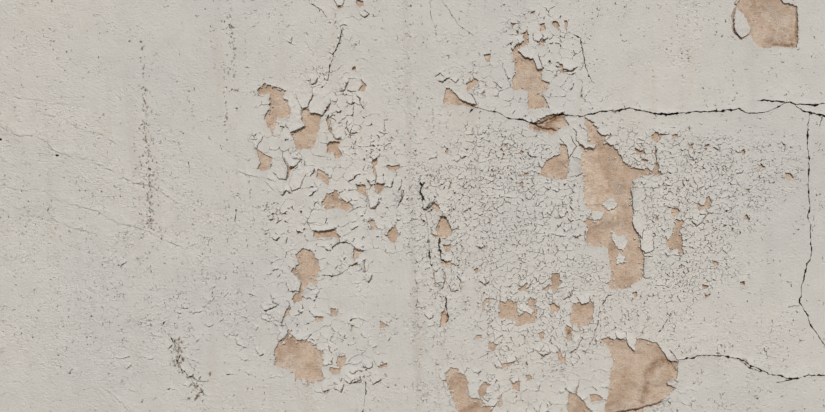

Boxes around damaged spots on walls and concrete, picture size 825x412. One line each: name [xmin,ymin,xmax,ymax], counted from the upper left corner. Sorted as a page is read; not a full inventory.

peeling [731,0,799,48]
peeling [77,0,656,412]
crack [418,176,446,267]
crack [470,99,825,345]
peeling [602,117,755,312]
peeling [600,329,708,412]
crack [676,353,825,383]